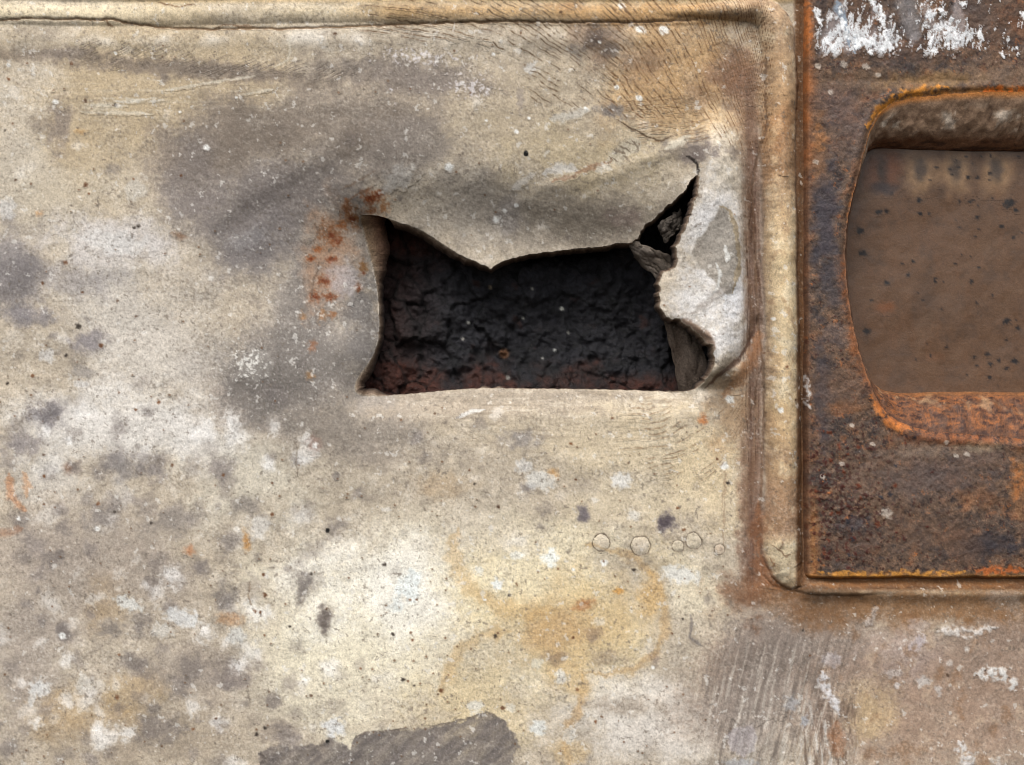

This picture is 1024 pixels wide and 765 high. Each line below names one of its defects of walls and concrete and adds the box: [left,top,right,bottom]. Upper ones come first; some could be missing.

corrosion [803,1,816,52]
corrosion [863,82,950,131]
corrosion [982,83,1024,92]
peeling [509,159,614,191]
peeling [664,135,692,151]
corrosion [880,149,909,185]
corrosion [287,175,397,355]
peeling [688,203,743,316]
corrosion [869,394,917,440]
corrosion [801,428,1024,603]
water stain [436,526,676,765]